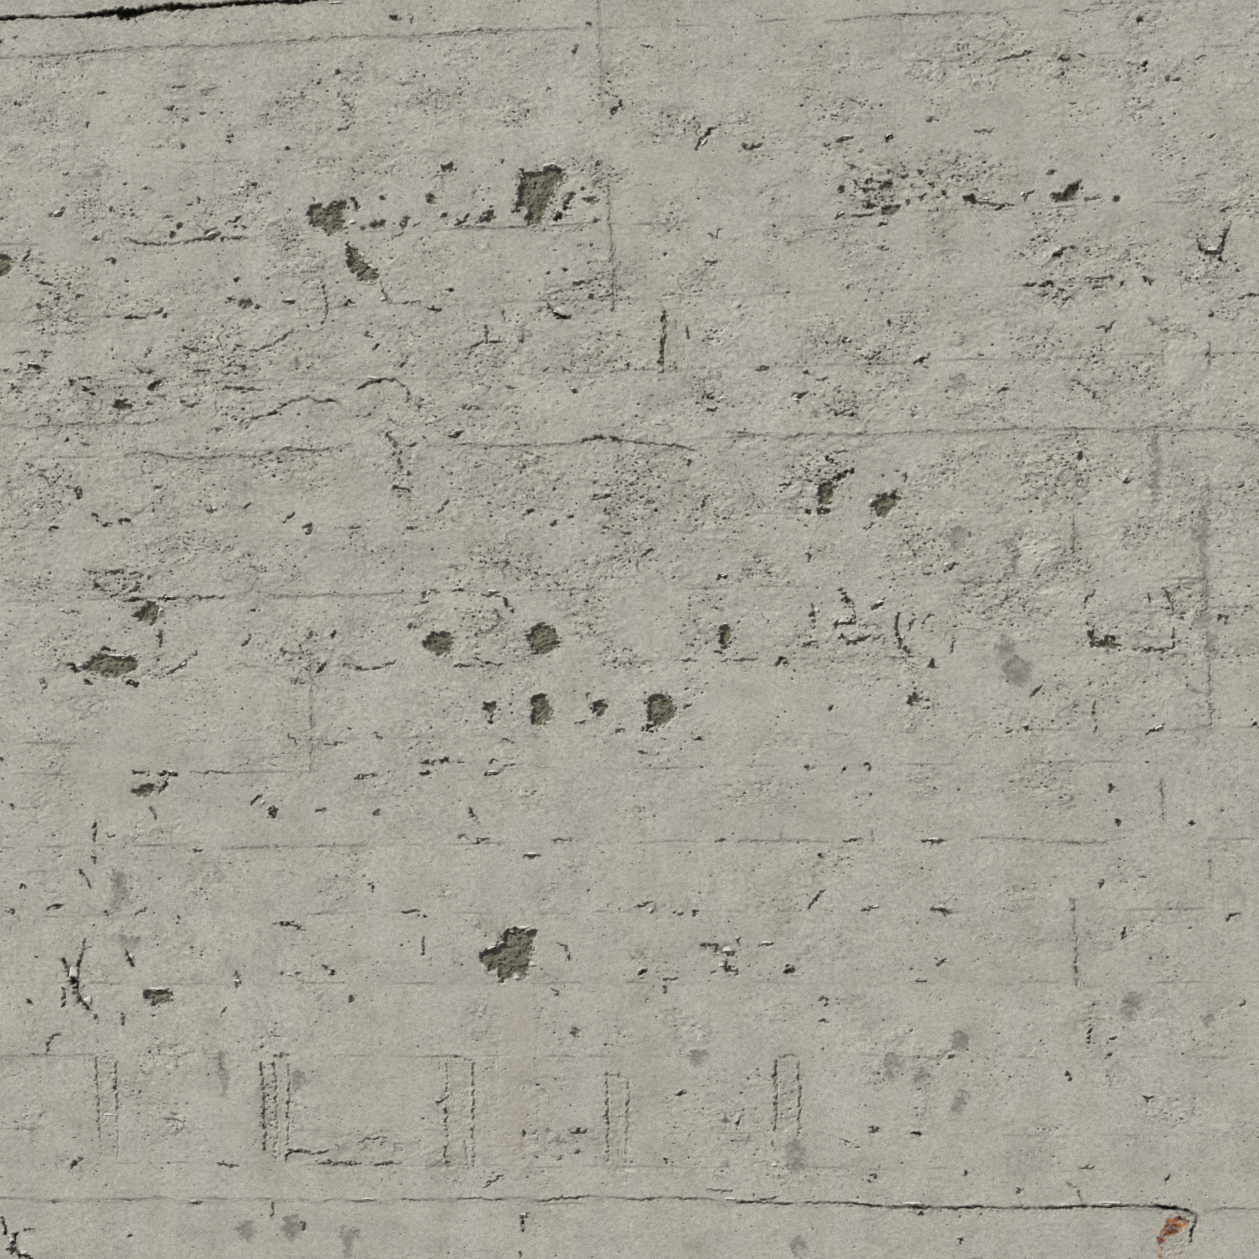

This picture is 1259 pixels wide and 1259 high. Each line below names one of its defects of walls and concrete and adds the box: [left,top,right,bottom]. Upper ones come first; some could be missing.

crack [825,8,1007,24]
crack [1060,7,1102,15]
crack [0,0,604,107]
spalling [512,163,599,226]
spalling [306,197,417,282]
spalling [805,451,855,515]
spalling [66,647,139,688]
spalling [408,623,505,668]
spalling [642,694,692,734]
spalling [479,926,538,983]
crack [0,1189,1259,1259]
corrosion [1155,1214,1191,1259]